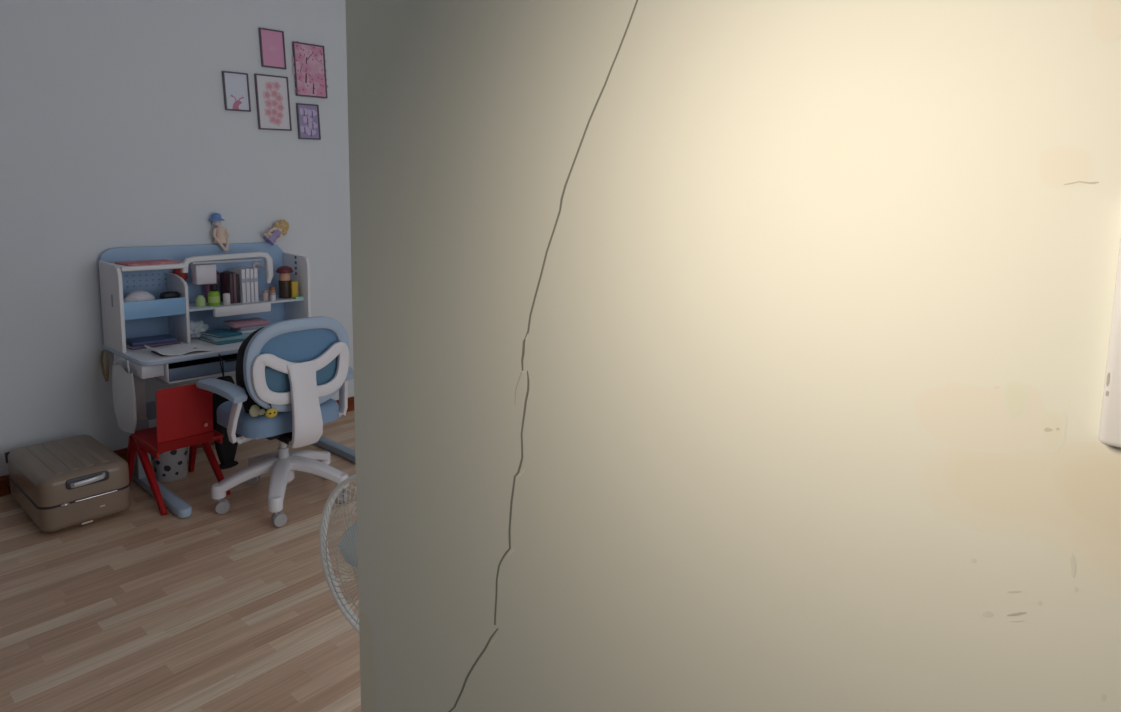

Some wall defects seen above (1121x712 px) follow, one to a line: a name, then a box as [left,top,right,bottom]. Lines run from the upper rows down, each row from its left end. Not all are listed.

crack [448,0,638,712]